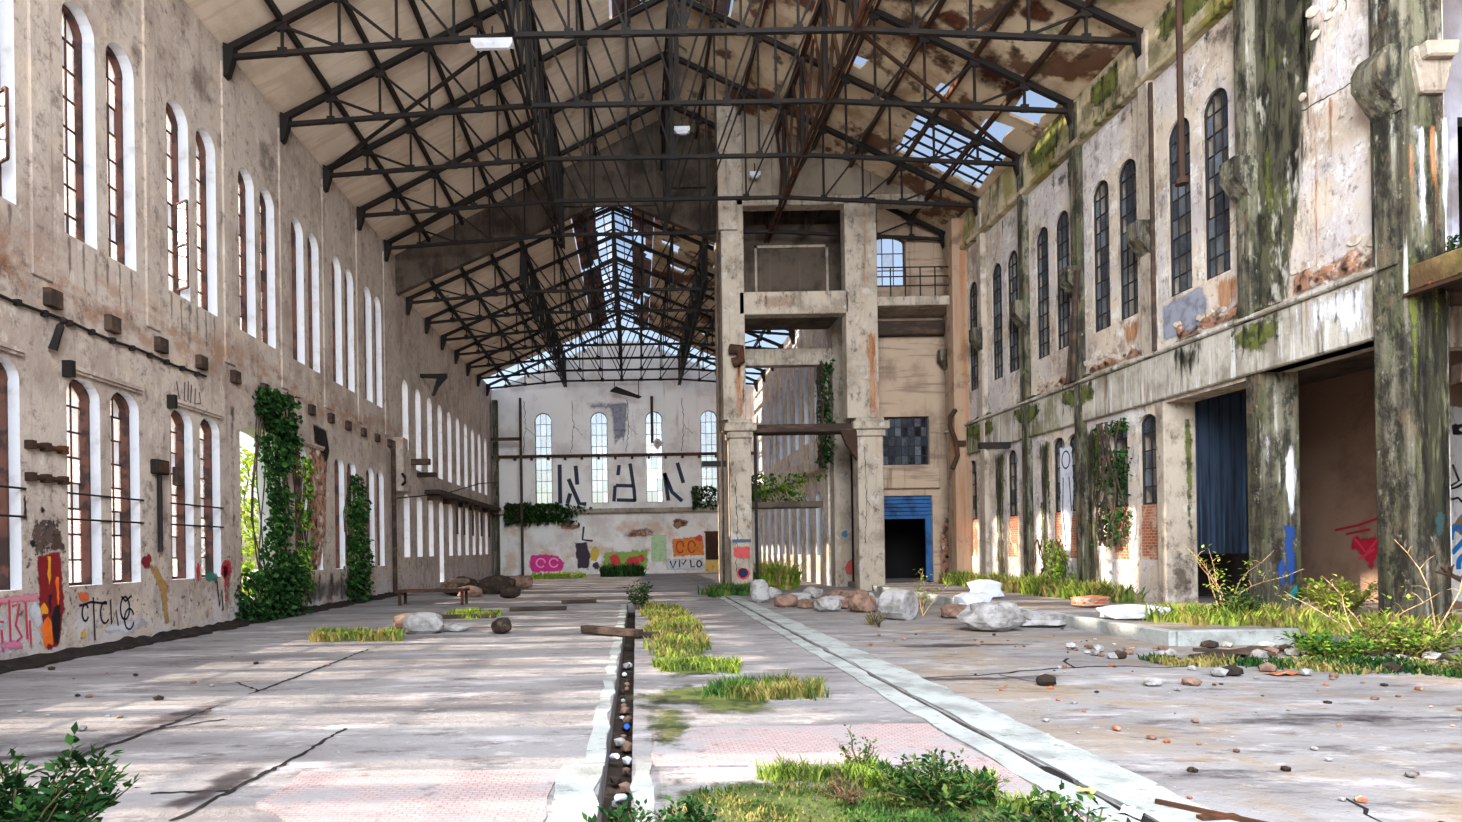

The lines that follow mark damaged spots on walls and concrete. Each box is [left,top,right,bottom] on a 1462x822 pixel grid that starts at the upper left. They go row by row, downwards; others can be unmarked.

leakage [1255,0,1311,271]
leakage [1414,118,1448,223]
flaking render [1290,232,1372,293]
flaking render [1173,304,1238,340]
leakage [1232,283,1367,353]
leakage [1408,257,1452,497]
crack [151,728,347,821]